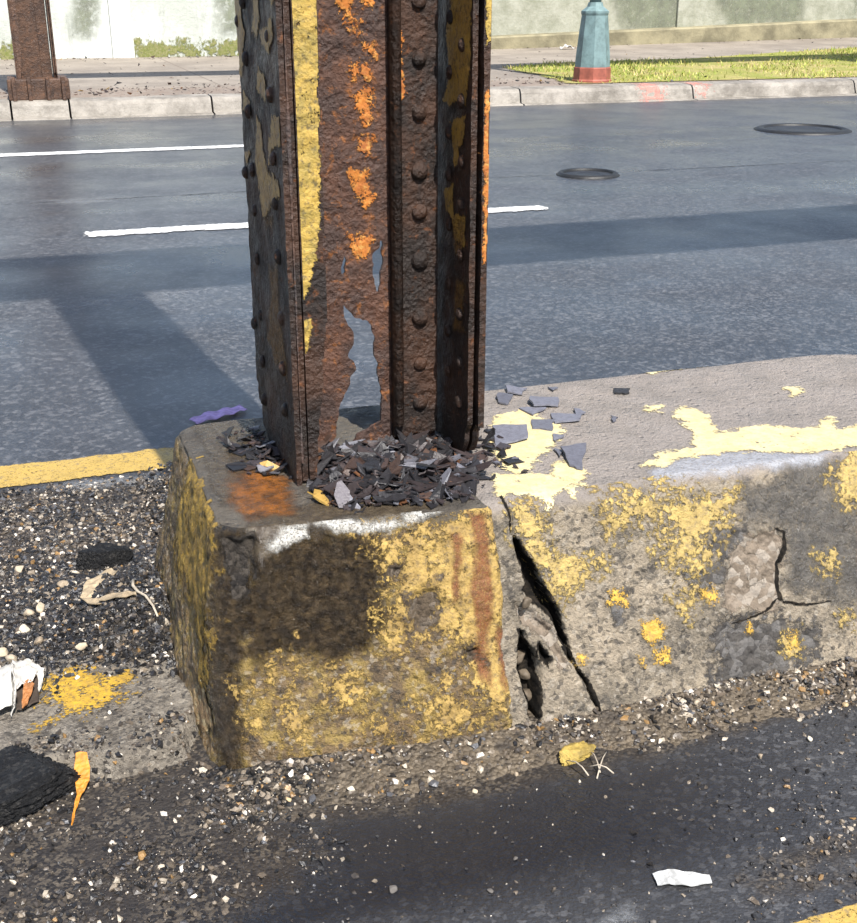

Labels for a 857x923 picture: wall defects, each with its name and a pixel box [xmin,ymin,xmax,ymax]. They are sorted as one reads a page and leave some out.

peeling [292,0,322,300]
rust [334,0,379,157]
rust [346,231,376,262]
rust [346,166,377,210]
rust [480,89,490,264]
peeling [304,318,313,354]
peeling [782,385,806,397]
rust [471,515,506,686]
peeling [173,404,857,758]
crack [499,495,601,719]
crack [732,527,831,624]
spalling [559,741,596,766]